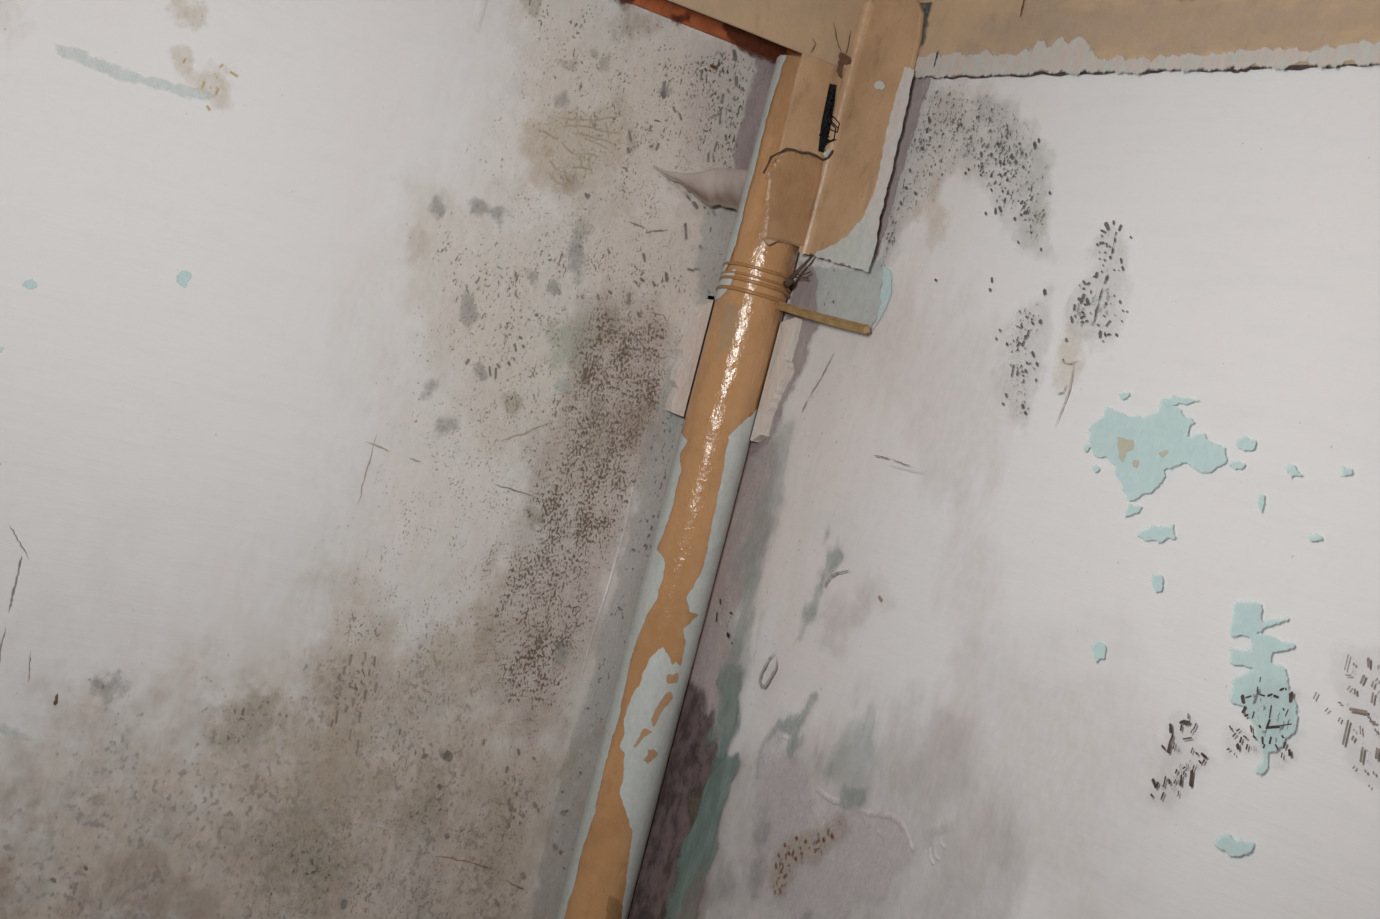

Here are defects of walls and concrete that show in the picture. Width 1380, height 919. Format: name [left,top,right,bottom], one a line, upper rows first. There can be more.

leakage [529,0,766,200]
leakage [880,80,1051,257]
peeling [749,77,930,455]
leakage [995,289,1046,418]
leakage [1065,220,1131,342]
crack [0,526,58,705]
leakage [406,199,716,879]
leakage [627,444,772,919]
peeling [1137,523,1175,542]
peeling [1083,392,1256,516]
leakage [1150,713,1207,800]
peeling [1229,601,1297,775]